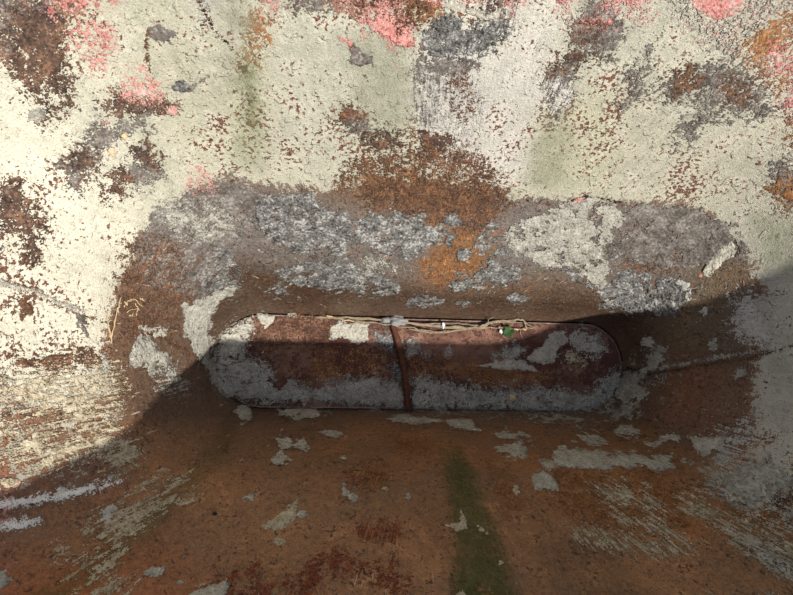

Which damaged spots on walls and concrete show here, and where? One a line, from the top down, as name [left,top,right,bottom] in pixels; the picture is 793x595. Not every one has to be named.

peeling [0,0,132,79]
peeling [171,75,210,93]
corrosion [611,0,793,158]
peeling [50,97,159,199]
corrosion [325,65,520,294]
corrosion [748,143,793,235]
peeling [670,279,692,317]
crack [622,345,793,376]
peeling [270,434,311,466]
corrosion [205,513,421,595]
water stain [449,456,510,595]
corrosion [538,451,697,560]